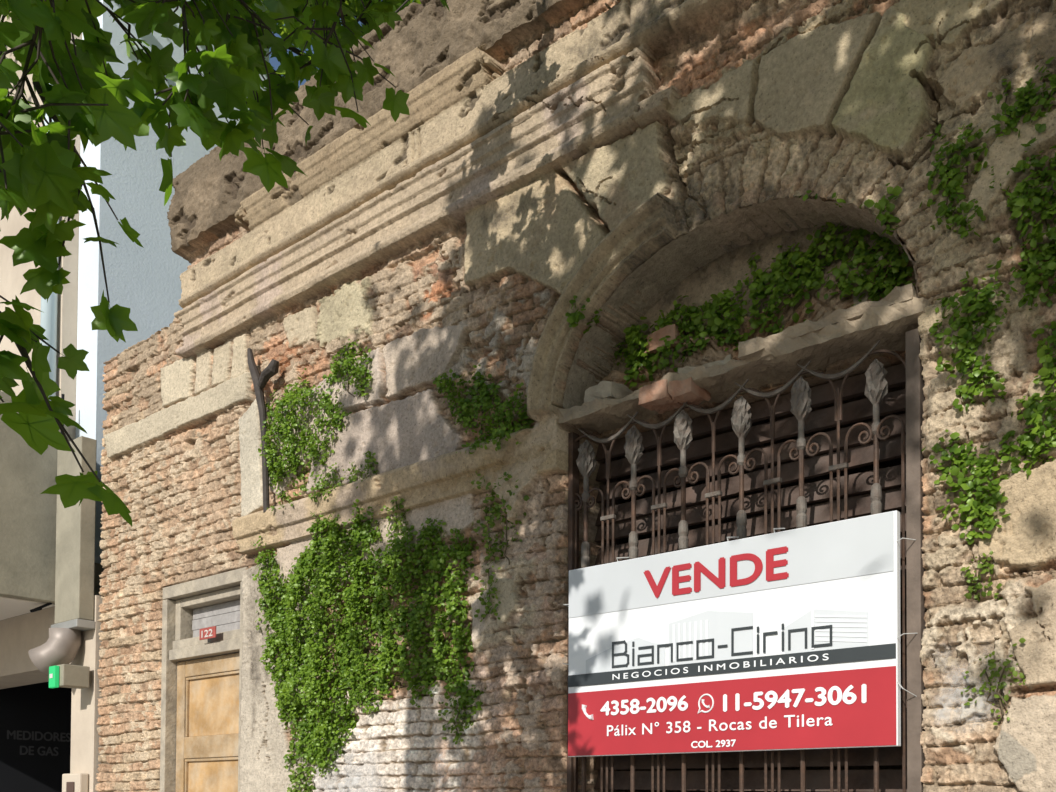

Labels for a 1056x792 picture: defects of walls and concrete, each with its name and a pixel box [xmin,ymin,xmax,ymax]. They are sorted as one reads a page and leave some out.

crack [577,176,617,206]